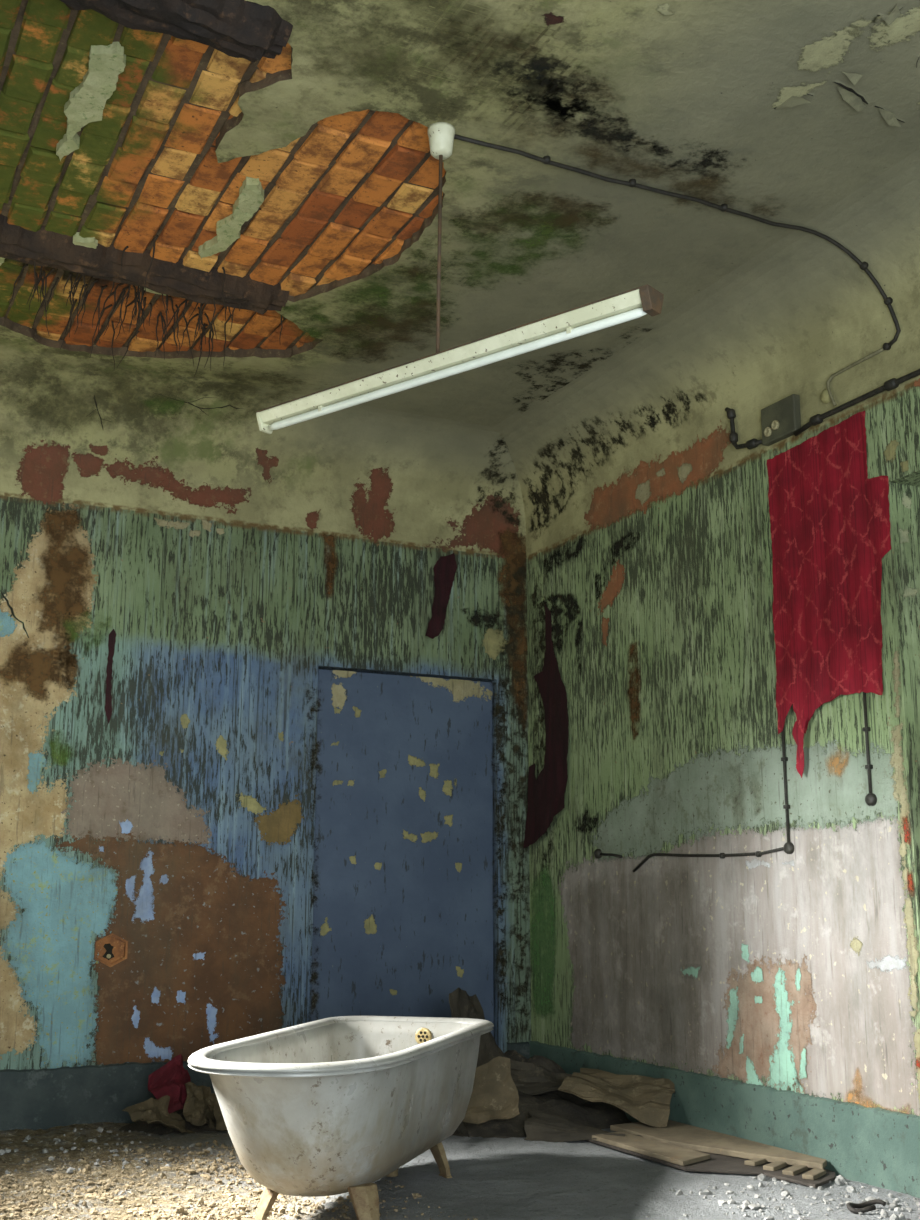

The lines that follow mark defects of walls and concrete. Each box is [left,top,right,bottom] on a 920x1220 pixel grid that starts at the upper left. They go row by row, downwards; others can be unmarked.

flaking render [0,0,445,296]
water stain [318,0,732,204]
peeling [772,5,920,127]
flaking render [0,257,315,352]
flaking render [305,509,321,531]
peeling [0,439,290,1069]
water stain [463,391,706,1036]
flaking render [557,647,920,1116]